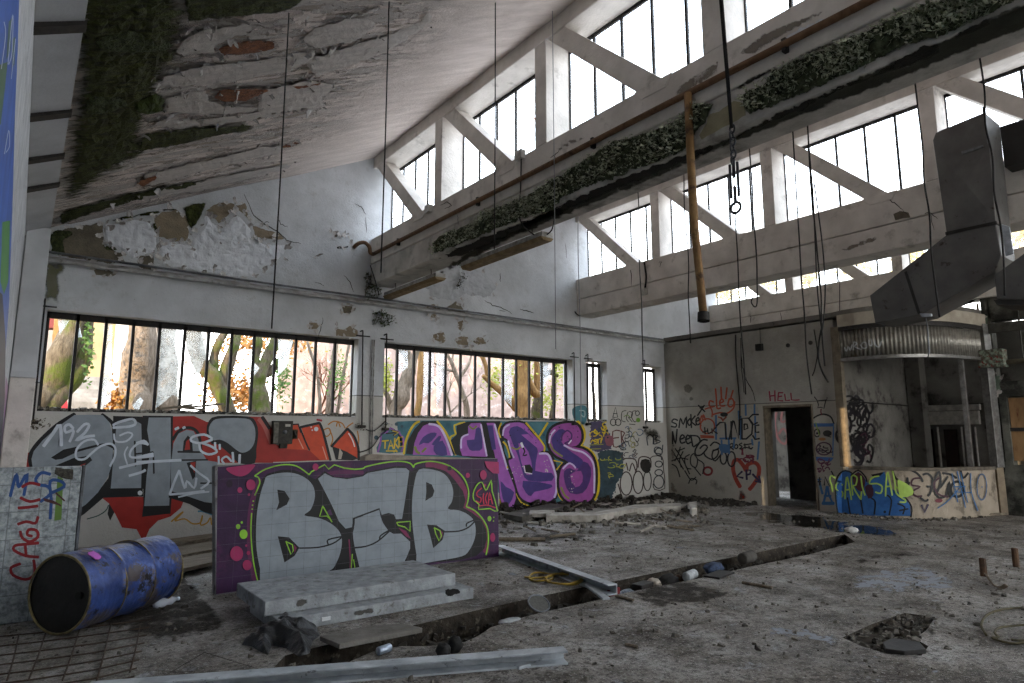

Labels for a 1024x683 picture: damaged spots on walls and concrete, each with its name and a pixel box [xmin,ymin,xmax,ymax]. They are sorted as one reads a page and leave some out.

peeling [139,8,432,140]
peeling [49,221,124,278]
peeling [137,251,157,271]
peeling [335,303,362,339]
peeling [425,302,489,351]